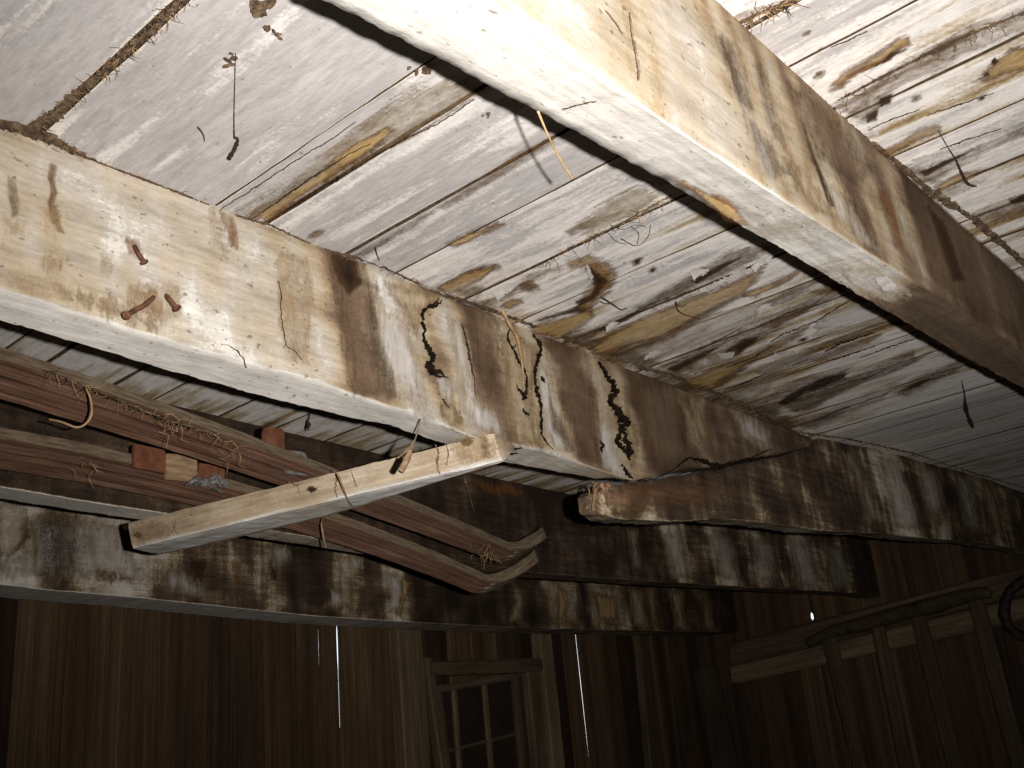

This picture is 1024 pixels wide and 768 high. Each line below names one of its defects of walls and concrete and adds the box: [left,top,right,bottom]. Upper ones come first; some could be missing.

water stain [721,37,782,132]
water stain [791,26,987,206]
water stain [331,231,402,397]
crack [420,298,477,408]
crack [507,330,553,455]
crack [598,361,802,482]
water stain [532,247,921,469]
water stain [899,366,957,395]